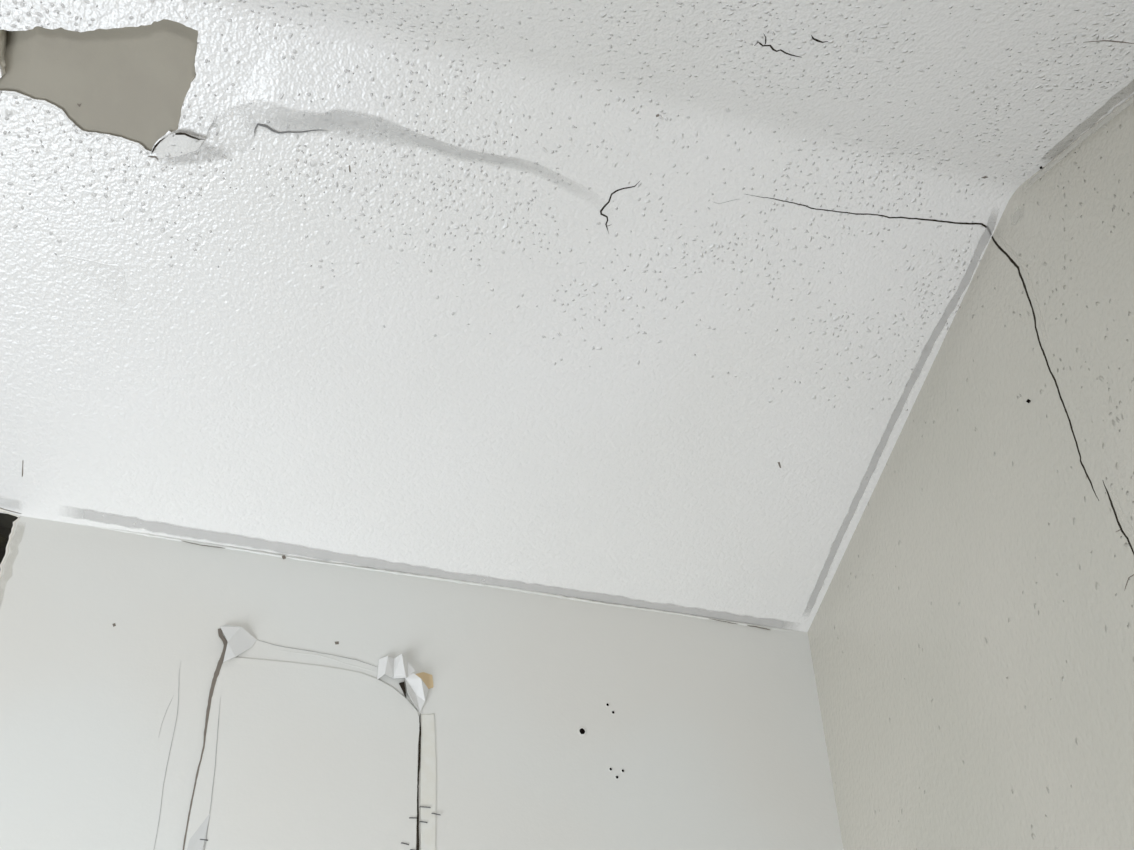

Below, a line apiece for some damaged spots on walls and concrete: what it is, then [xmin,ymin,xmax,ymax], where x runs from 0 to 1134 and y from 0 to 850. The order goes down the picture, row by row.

peeling [0,19,205,160]
crack [600,181,640,233]
crack [714,194,1134,588]